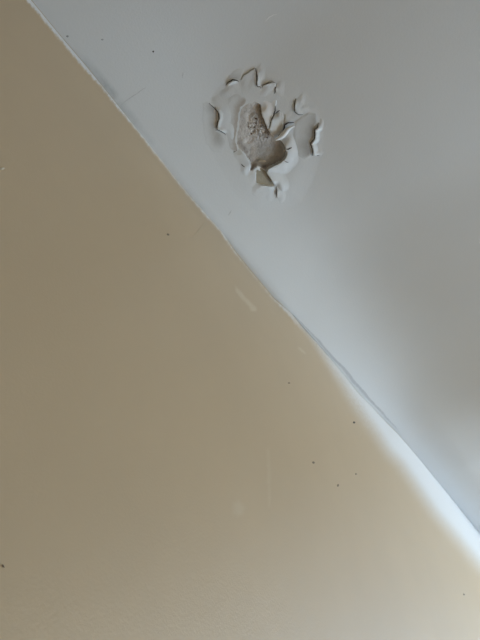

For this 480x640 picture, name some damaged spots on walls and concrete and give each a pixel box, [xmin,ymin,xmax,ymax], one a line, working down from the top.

peeling [202,62,324,204]